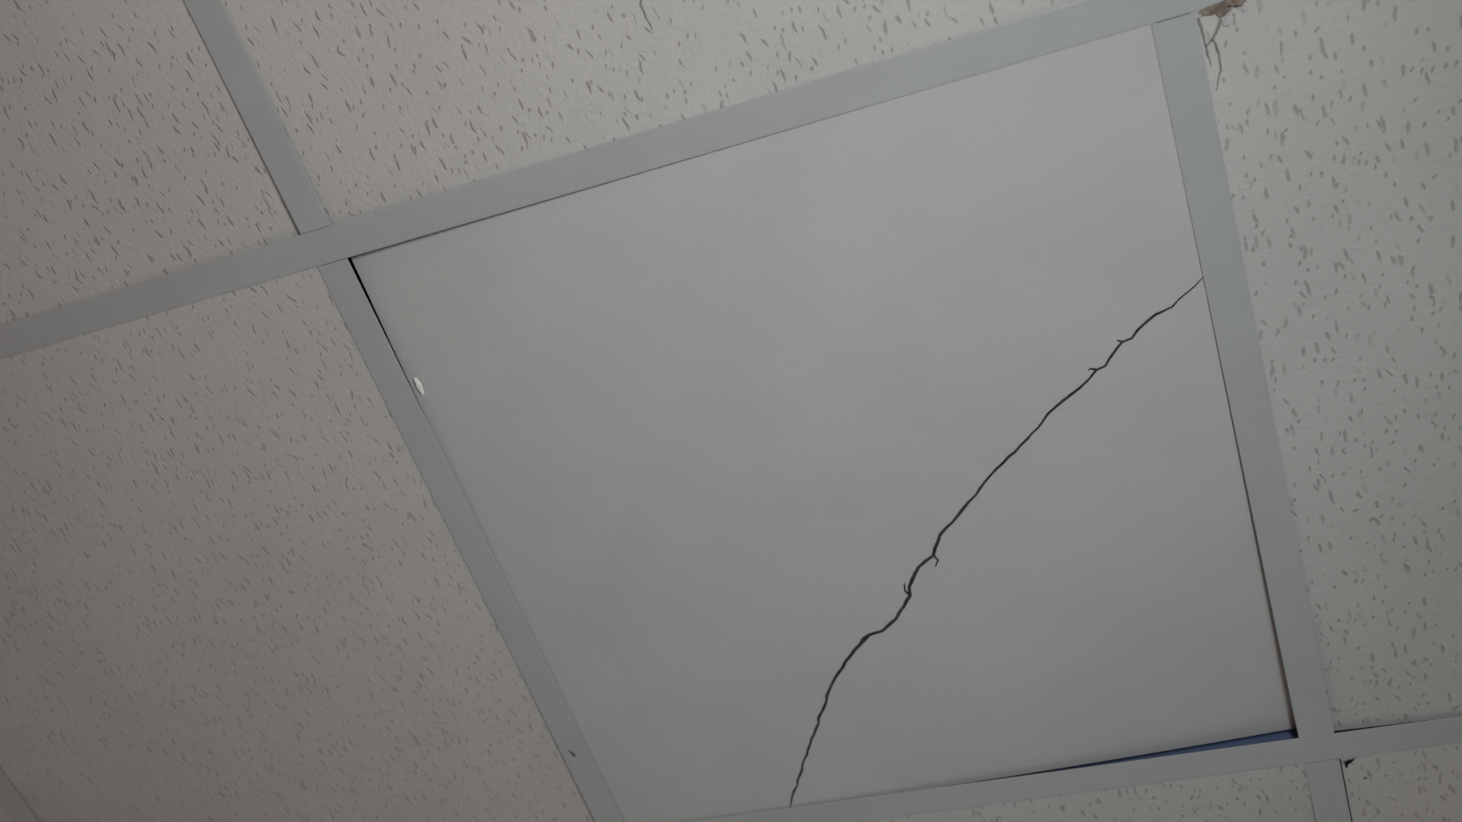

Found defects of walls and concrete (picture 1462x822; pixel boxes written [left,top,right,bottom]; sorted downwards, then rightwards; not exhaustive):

crack [789,277,1203,808]